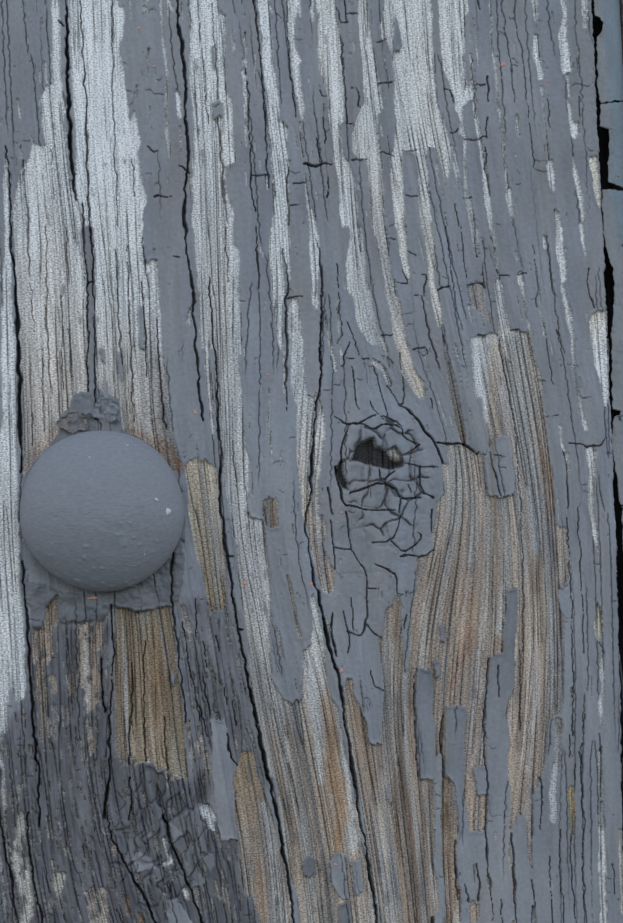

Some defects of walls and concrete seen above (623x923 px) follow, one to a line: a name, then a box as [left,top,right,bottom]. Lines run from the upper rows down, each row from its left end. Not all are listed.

crack [245,0,393,289]
peeling [0,0,228,813]
crack [0,0,295,923]
peeling [189,0,569,923]
crack [281,0,619,923]
peeling [0,784,41,923]
peeling [50,859,67,915]
peeling [84,887,110,923]
peeling [133,821,188,873]
peeling [167,854,215,923]